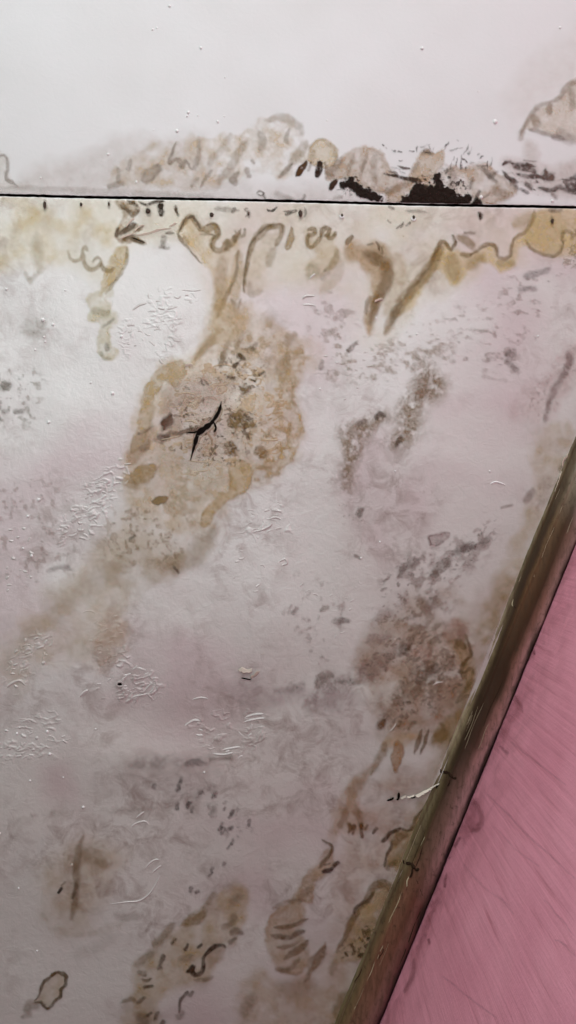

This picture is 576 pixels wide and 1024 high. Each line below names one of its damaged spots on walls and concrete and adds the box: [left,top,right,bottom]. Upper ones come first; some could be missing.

water stain [296,139,576,204]
water stain [115,200,238,253]
water stain [276,226,389,271]
water stain [388,238,463,328]
water stain [135,366,207,451]
crack [166,396,223,461]
water stain [201,351,264,461]
water stain [383,730,451,772]
peeling [387,769,457,801]
water stain [349,810,422,867]
water stain [172,941,225,977]
water stain [38,971,68,1010]